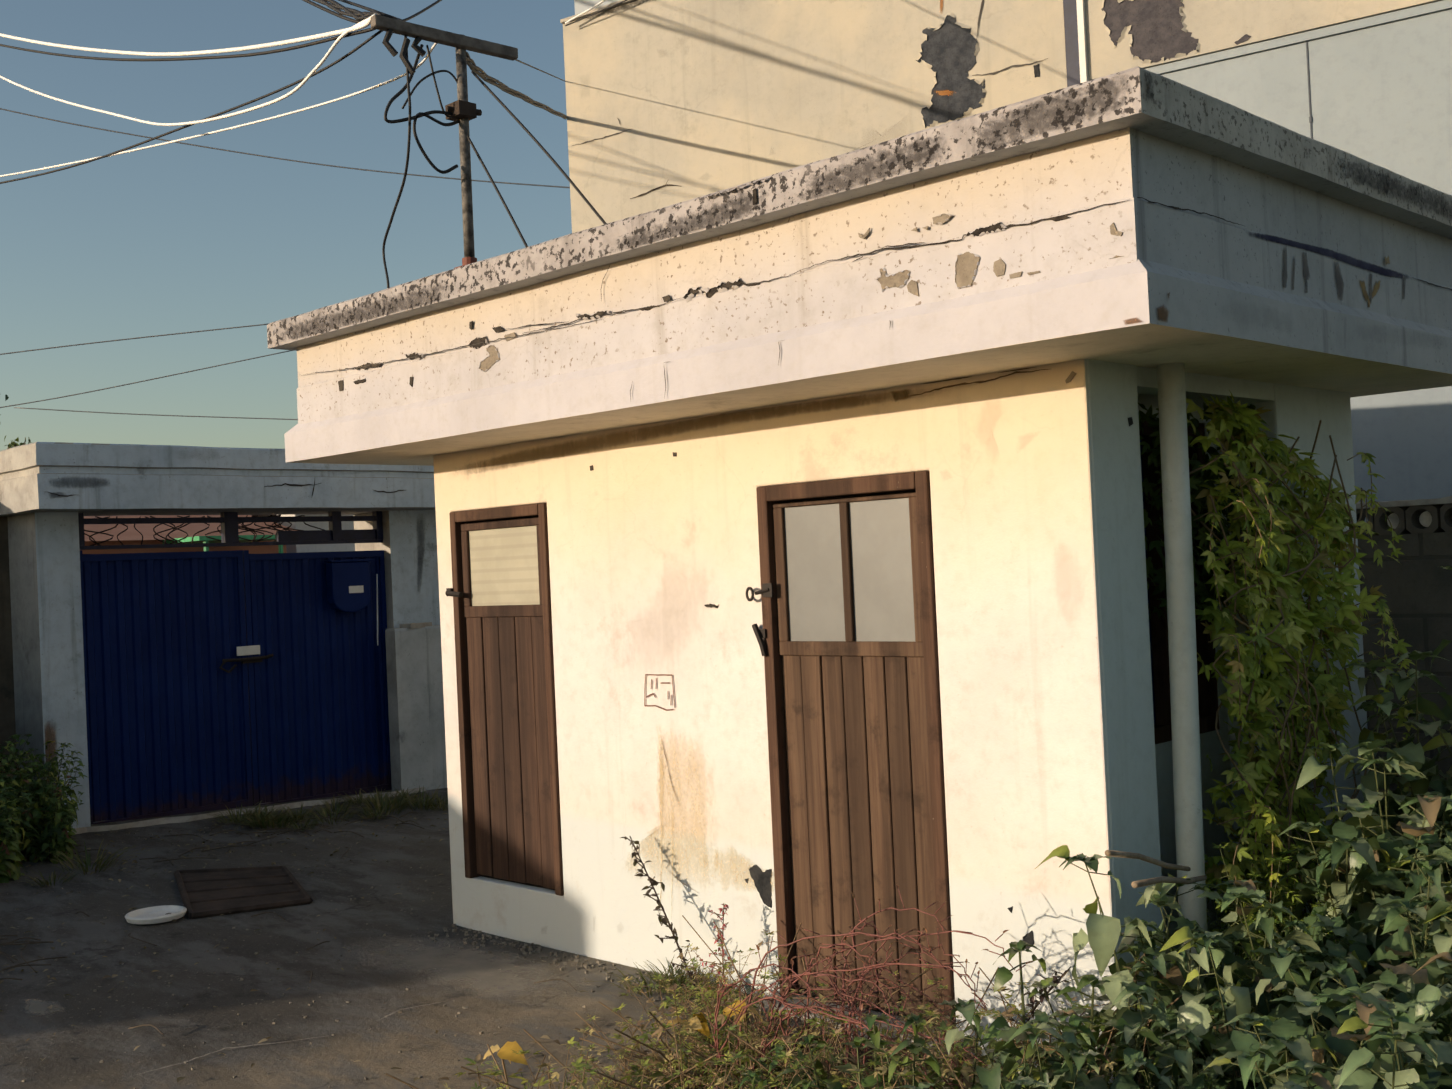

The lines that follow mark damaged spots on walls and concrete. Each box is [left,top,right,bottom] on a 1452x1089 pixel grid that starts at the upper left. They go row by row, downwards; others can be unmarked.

peeling [1101,0,1201,64]
peeling [915,12,986,128]
leakage [980,79,1123,149]
leakage [809,138,937,199]
leakage [619,194,764,248]
peeling [875,268,919,296]
peeling [911,213,952,232]
crack [748,197,1244,284]
peeling [954,222,1041,289]
crack [299,266,680,375]
spalling [744,865,772,908]